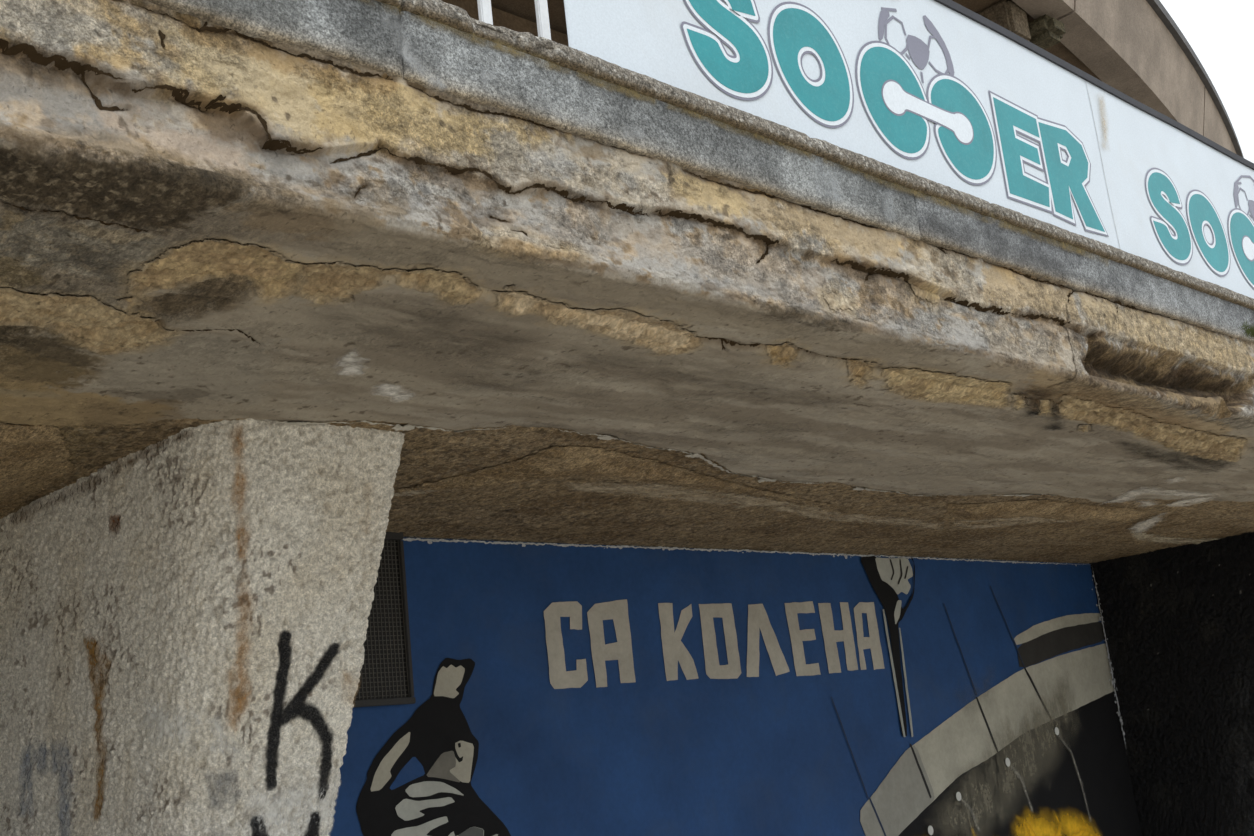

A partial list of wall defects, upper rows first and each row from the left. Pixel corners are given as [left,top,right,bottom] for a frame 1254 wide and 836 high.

crack [117,0,557,130]
crack [0,38,785,264]
crack [691,173,883,230]
spalling [0,239,703,356]
crack [831,259,911,285]
crack [944,267,1203,328]
spalling [846,302,1254,462]
rust [84,639,111,820]